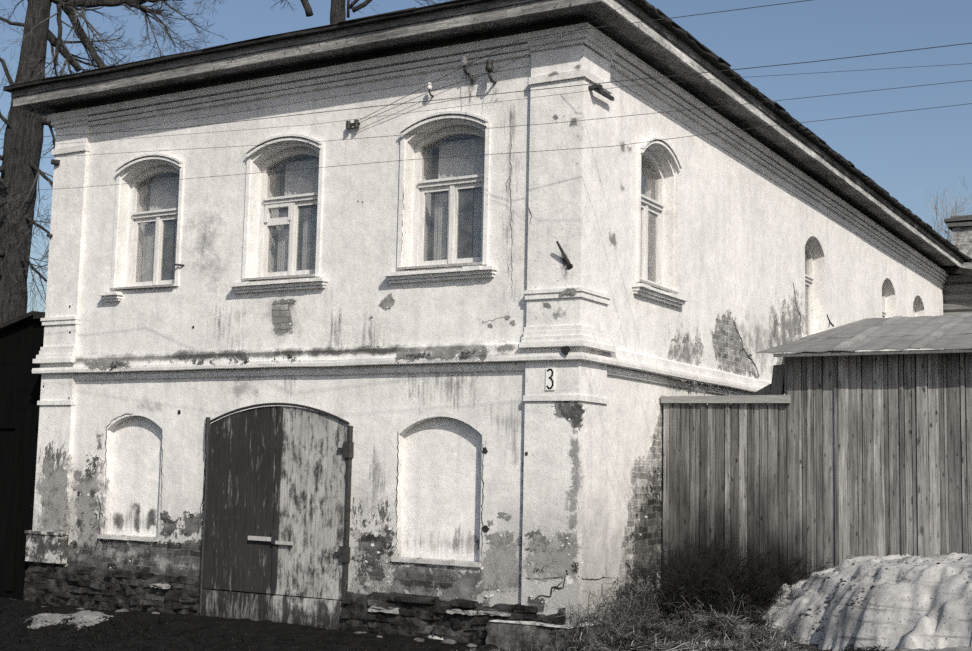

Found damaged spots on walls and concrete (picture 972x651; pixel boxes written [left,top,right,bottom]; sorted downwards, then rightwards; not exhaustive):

crack [506,110,532,287]
water stain [77,344,484,361]
flaking render [271,298,296,336]
spalling [366,293,395,323]
flaking render [669,311,759,379]
peeling [777,294,805,365]
flaking render [33,434,205,577]
flaking render [349,401,586,607]
spalling [527,596,554,615]
crack [526,562,613,600]